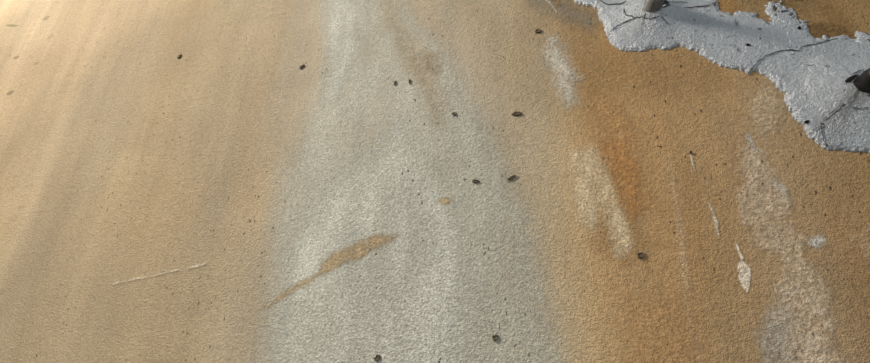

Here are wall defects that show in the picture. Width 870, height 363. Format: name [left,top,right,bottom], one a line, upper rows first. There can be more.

crack [574,0,870,154]
water stain [809,23,857,39]